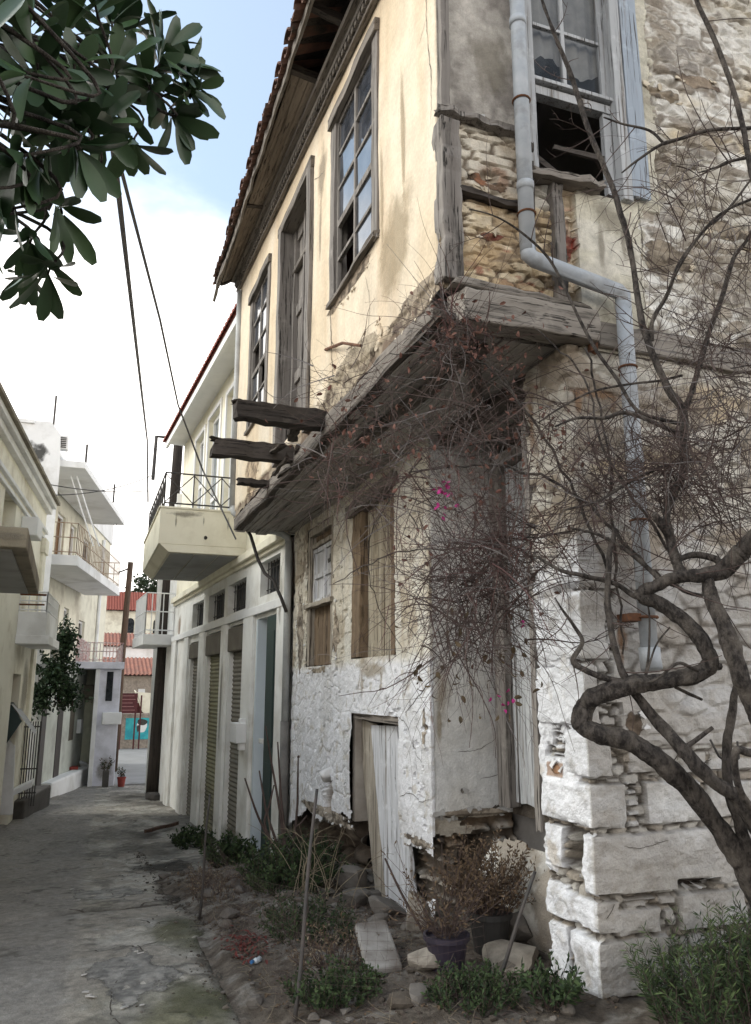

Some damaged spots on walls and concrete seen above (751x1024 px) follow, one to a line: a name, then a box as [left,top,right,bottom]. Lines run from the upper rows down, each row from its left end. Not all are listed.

spalling [467,170,507,193]
flaking render [476,229,504,241]
flaking render [565,215,579,262]
spalling [317,270,436,411]